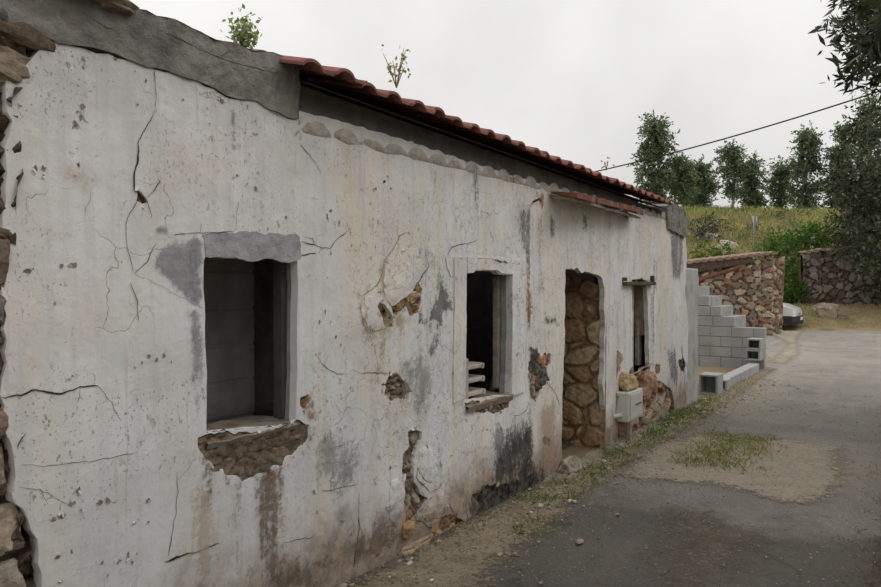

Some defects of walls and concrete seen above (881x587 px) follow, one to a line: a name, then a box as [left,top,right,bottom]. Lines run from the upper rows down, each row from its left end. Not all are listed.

crack [125,72,198,320]
crack [301,224,349,256]
damp [156,237,202,377]
crack [318,230,411,374]
spalling [378,283,422,327]
crack [2,385,120,419]
spalling [197,396,310,481]
spalling [381,372,412,404]
spalling [402,427,425,522]
damp [471,347,547,518]
spalling [528,347,550,401]
damp [256,467,315,587]